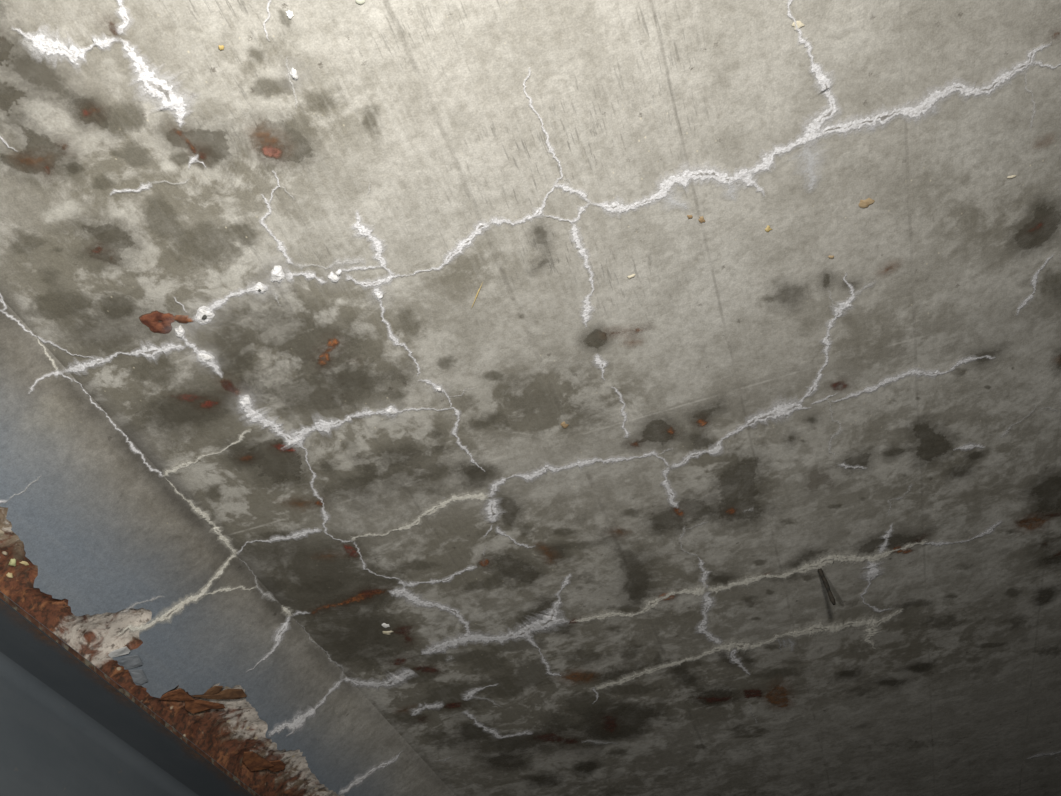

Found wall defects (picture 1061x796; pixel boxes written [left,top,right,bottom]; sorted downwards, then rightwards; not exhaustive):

water stain [0,36,109,128]
crack [15,0,188,125]
water stain [0,125,76,174]
crack [412,0,1061,325]
water stain [82,224,135,264]
rust [173,315,195,324]
water stain [583,329,607,348]
water stain [229,439,303,483]
crack [0,173,1001,701]
spalling [0,507,344,796]
crack [269,665,414,736]
crack [412,684,532,739]